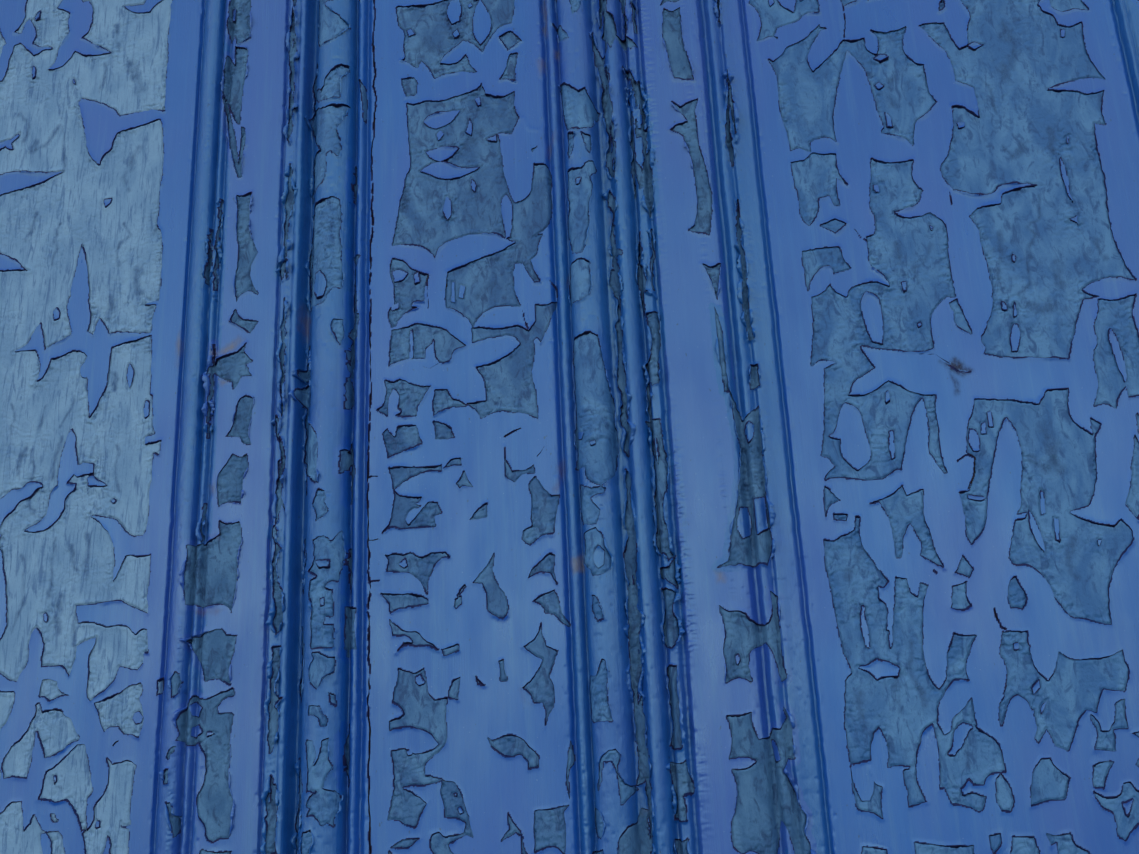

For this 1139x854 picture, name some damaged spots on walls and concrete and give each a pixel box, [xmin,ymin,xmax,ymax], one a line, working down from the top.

peeling [0,0,371,854]
peeling [375,0,817,854]
peeling [743,0,1139,854]